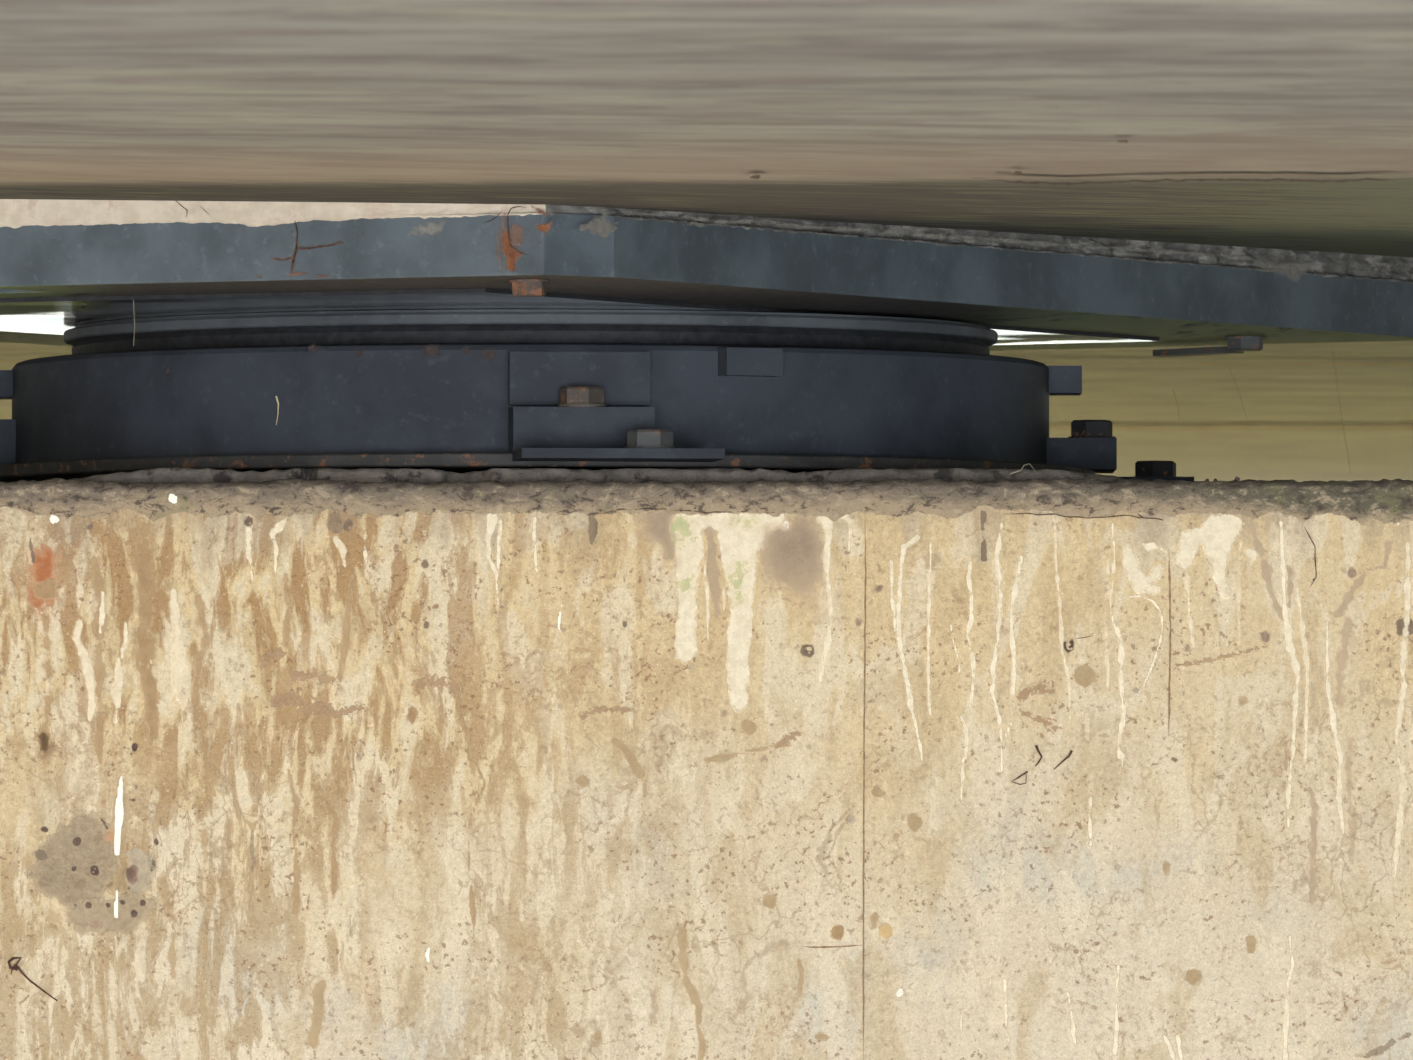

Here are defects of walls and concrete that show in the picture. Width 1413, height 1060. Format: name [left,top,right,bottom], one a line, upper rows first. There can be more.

crack [273,221,342,274]
rust [501,228,521,271]
rust [28,538,62,616]
leakage [33,614,63,760]
leakage [72,521,216,796]
leakage [261,519,368,719]
leakage [485,513,503,605]
leakage [639,508,853,711]
leakage [889,534,932,761]
leakage [950,523,1071,800]
leakage [1110,514,1318,903]
leakage [1326,541,1412,876]